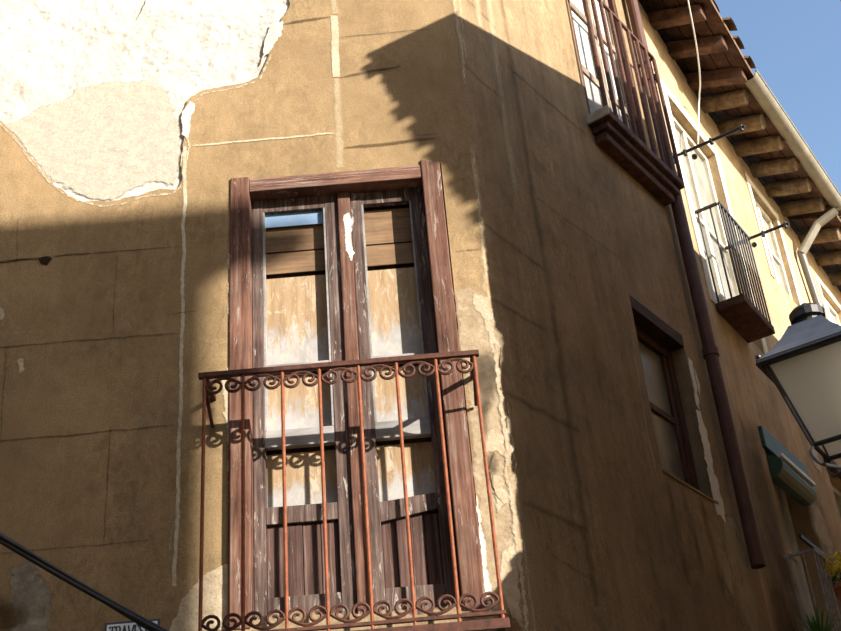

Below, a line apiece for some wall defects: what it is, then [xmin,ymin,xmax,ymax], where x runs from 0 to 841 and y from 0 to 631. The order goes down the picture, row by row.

flaking render [0,0,290,207]
flaking render [455,288,534,631]
flaking render [688,357,726,523]